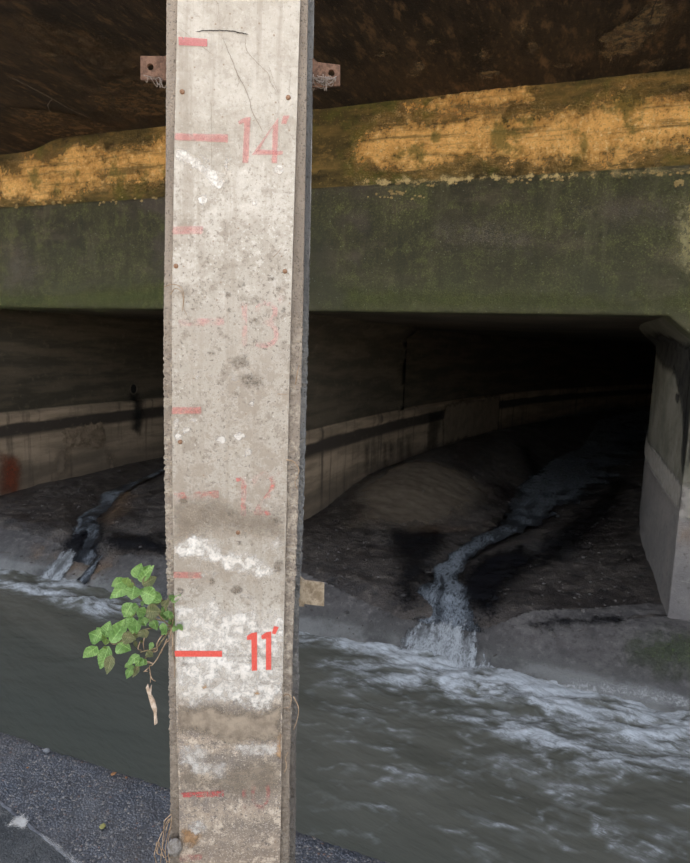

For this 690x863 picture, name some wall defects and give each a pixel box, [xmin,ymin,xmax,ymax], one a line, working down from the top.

crack [183,1,291,134]
leakage [675,198,690,271]
leakage [645,333,690,519]